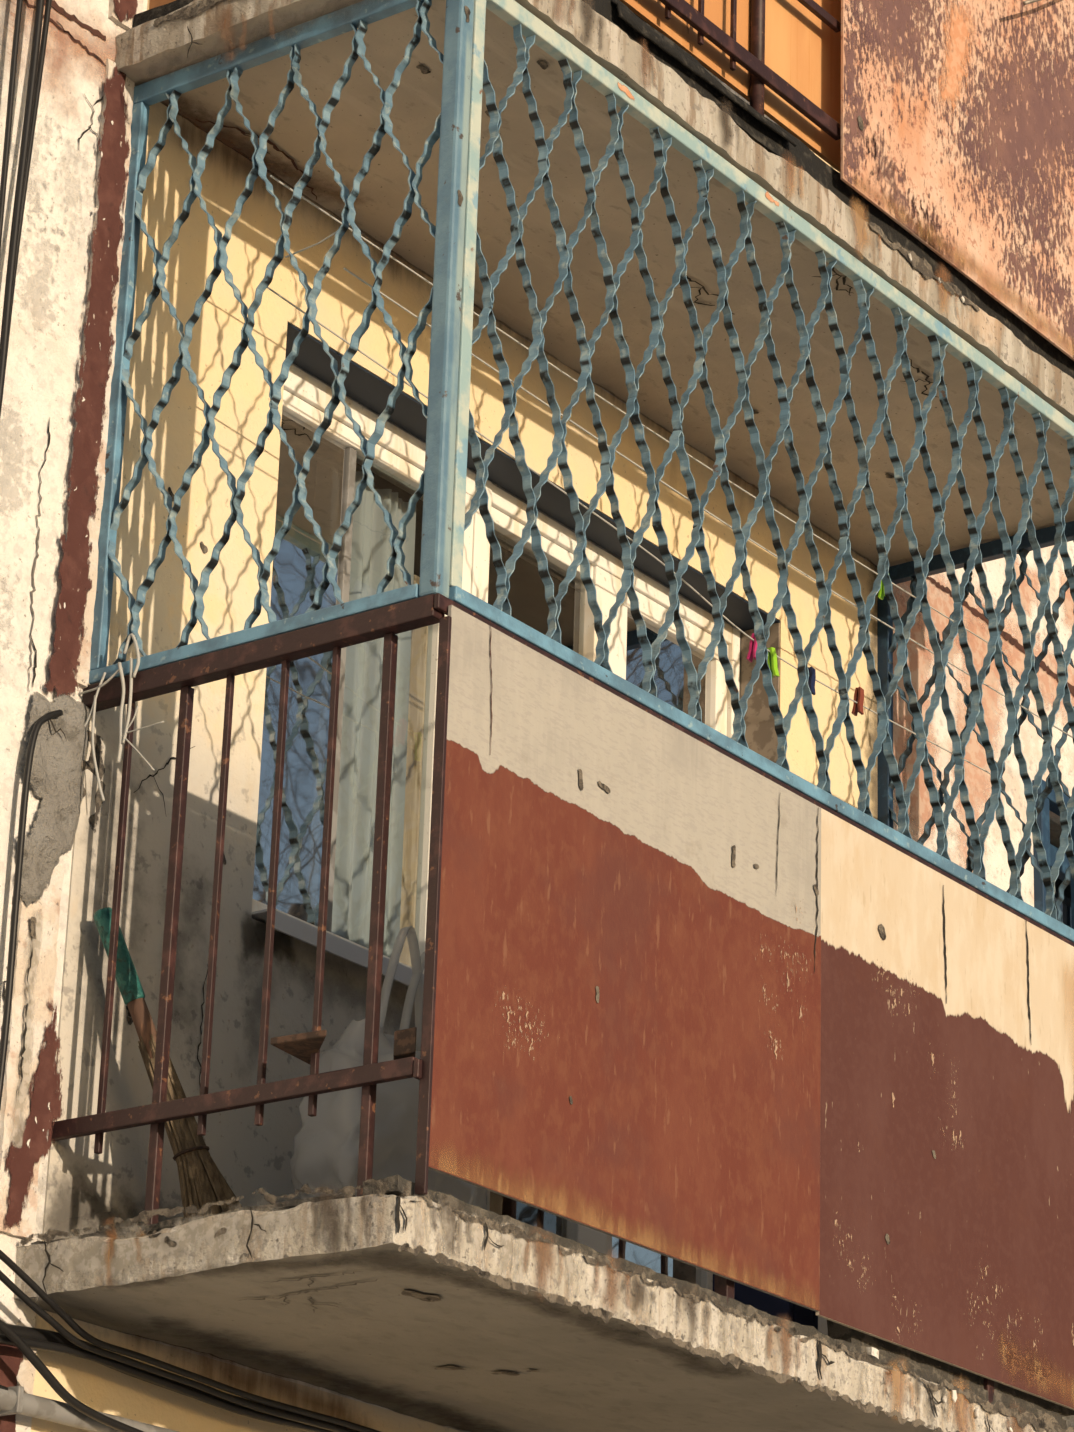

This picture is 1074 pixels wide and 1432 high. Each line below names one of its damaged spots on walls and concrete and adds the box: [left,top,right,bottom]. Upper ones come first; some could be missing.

peeling [113,0,138,23]
spalling [153,0,222,27]
rust [938,0,975,117]
rust [854,205,881,248]
crack [28,418,51,692]
peeling [4,912,1074,1432]
rust [463,1170,713,1271]
crack [244,1207,377,1313]
rust [526,1236,551,1287]
rust [596,1260,629,1307]
rust [768,1322,799,1374]